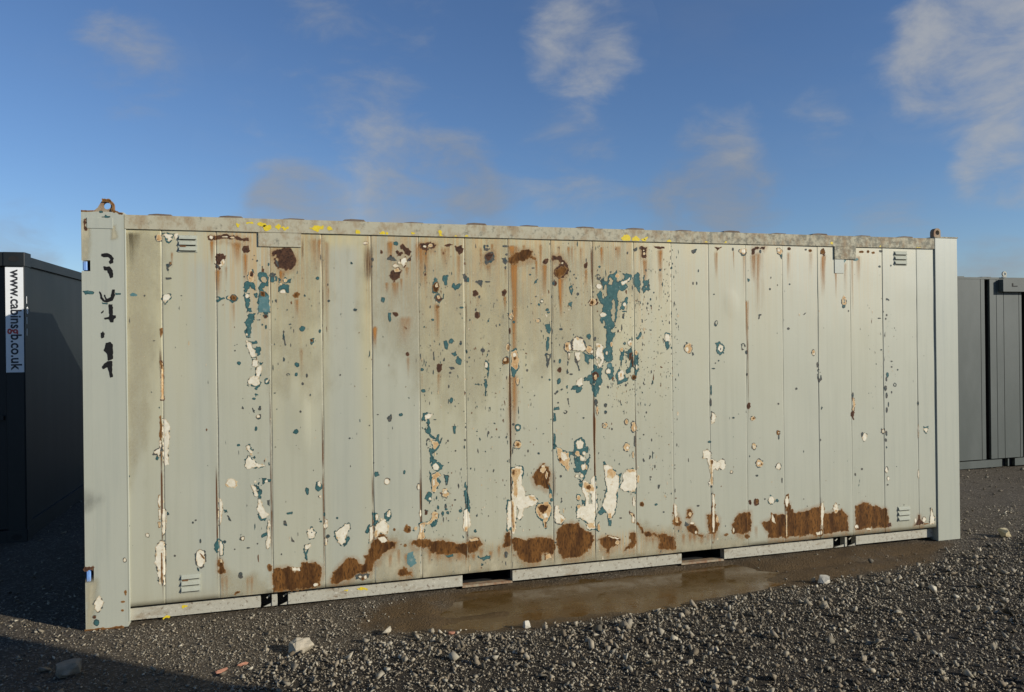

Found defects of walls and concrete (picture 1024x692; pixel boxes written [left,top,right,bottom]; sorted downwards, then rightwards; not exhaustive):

peeling [216,266,291,420]
rust [271,247,297,279]
rust [485,245,569,345]
peeling [152,418,171,465]
peeling [413,412,450,540]
peeling [506,262,650,534]
peeling [145,495,169,587]
rust [267,484,483,592]
rust [502,493,891,563]